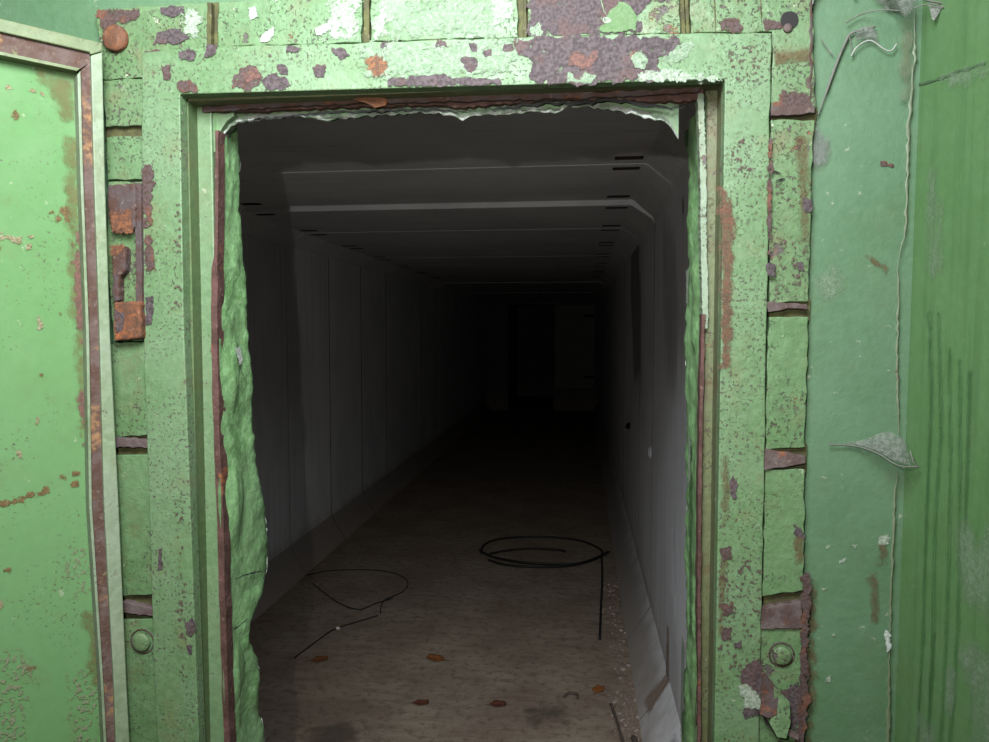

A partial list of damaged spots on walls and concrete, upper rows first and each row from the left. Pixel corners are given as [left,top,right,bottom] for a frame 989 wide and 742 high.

rust [145,5,218,93]
rust [202,45,368,113]
peeling [314,0,362,43]
spalling [435,111,480,121]
rust [331,0,700,105]
spalling [496,104,574,115]
spalling [626,110,665,122]
rust [714,0,743,34]
rust [772,0,814,107]
rust [109,164,157,272]
rust [715,186,739,371]
rust [793,524,821,742]